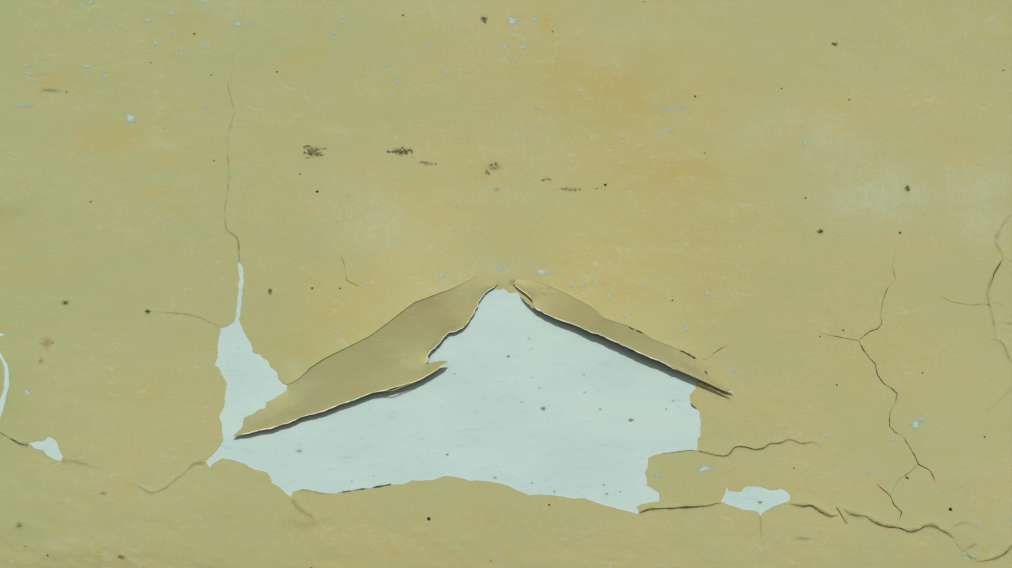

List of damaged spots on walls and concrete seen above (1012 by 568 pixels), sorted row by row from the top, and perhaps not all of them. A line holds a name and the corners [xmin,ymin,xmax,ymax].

peeling [0,353,9,417]
peeling [206,262,732,514]
crack [789,277,1012,564]
peeling [29,437,63,461]
crack [697,433,825,457]
crack [637,496,721,515]
peeling [721,486,790,516]